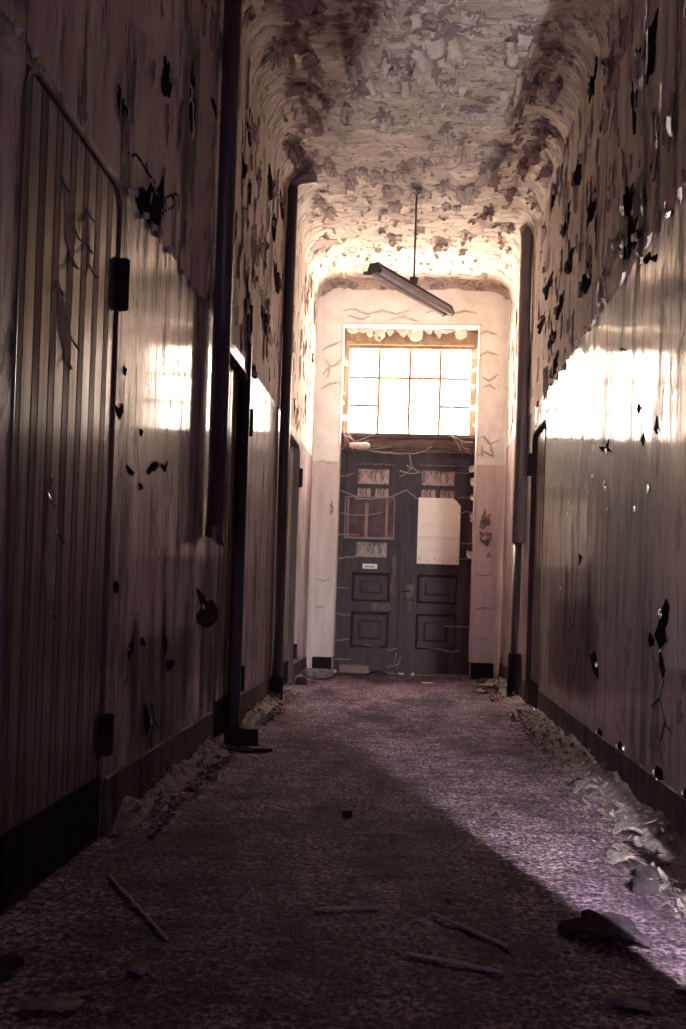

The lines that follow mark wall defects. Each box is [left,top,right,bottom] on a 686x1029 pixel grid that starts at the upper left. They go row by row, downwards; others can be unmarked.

peeling [115,0,223,308]
peeling [232,0,686,440]
spalling [196,587,220,628]
spalling [648,599,670,679]